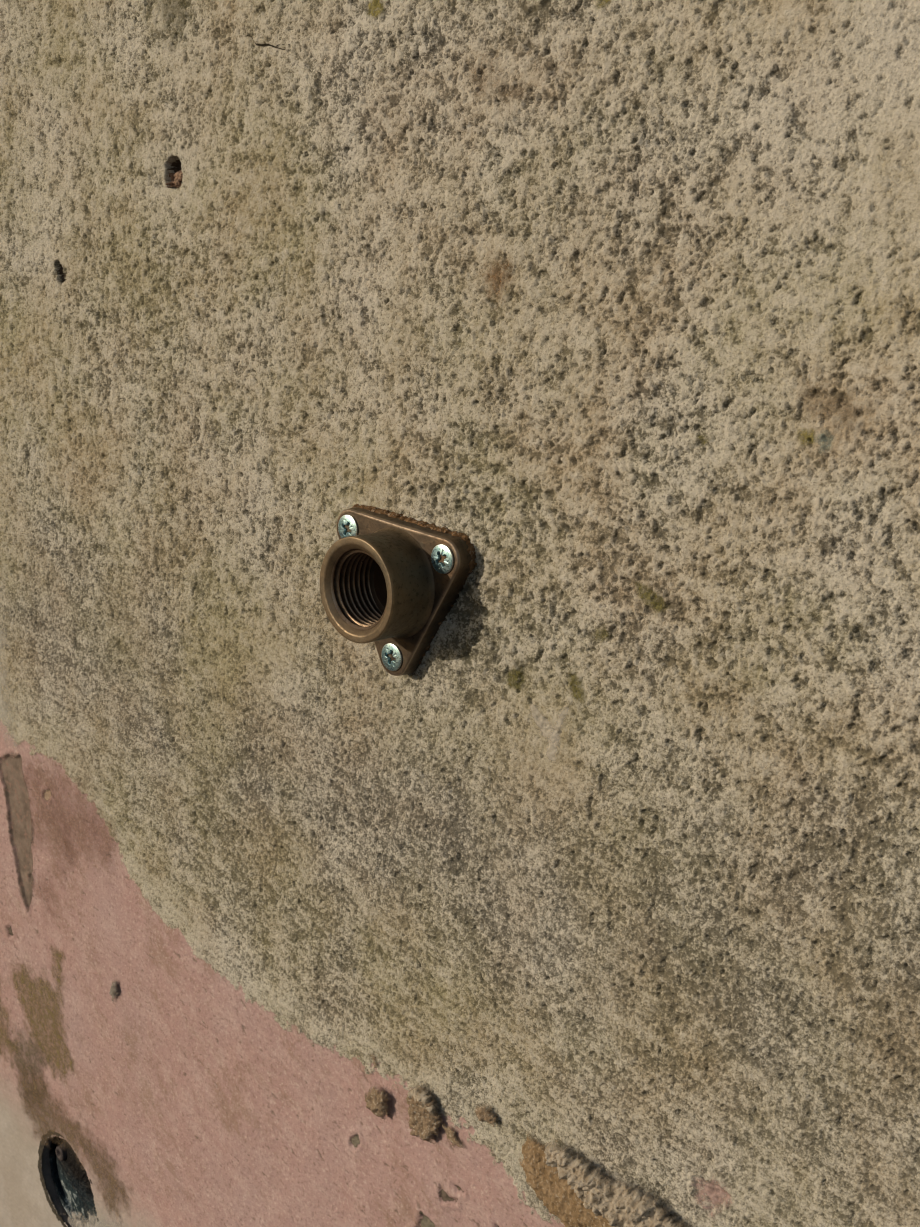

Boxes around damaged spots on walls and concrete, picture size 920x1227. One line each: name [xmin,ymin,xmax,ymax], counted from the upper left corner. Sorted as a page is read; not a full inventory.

damp [0,952,125,1210]